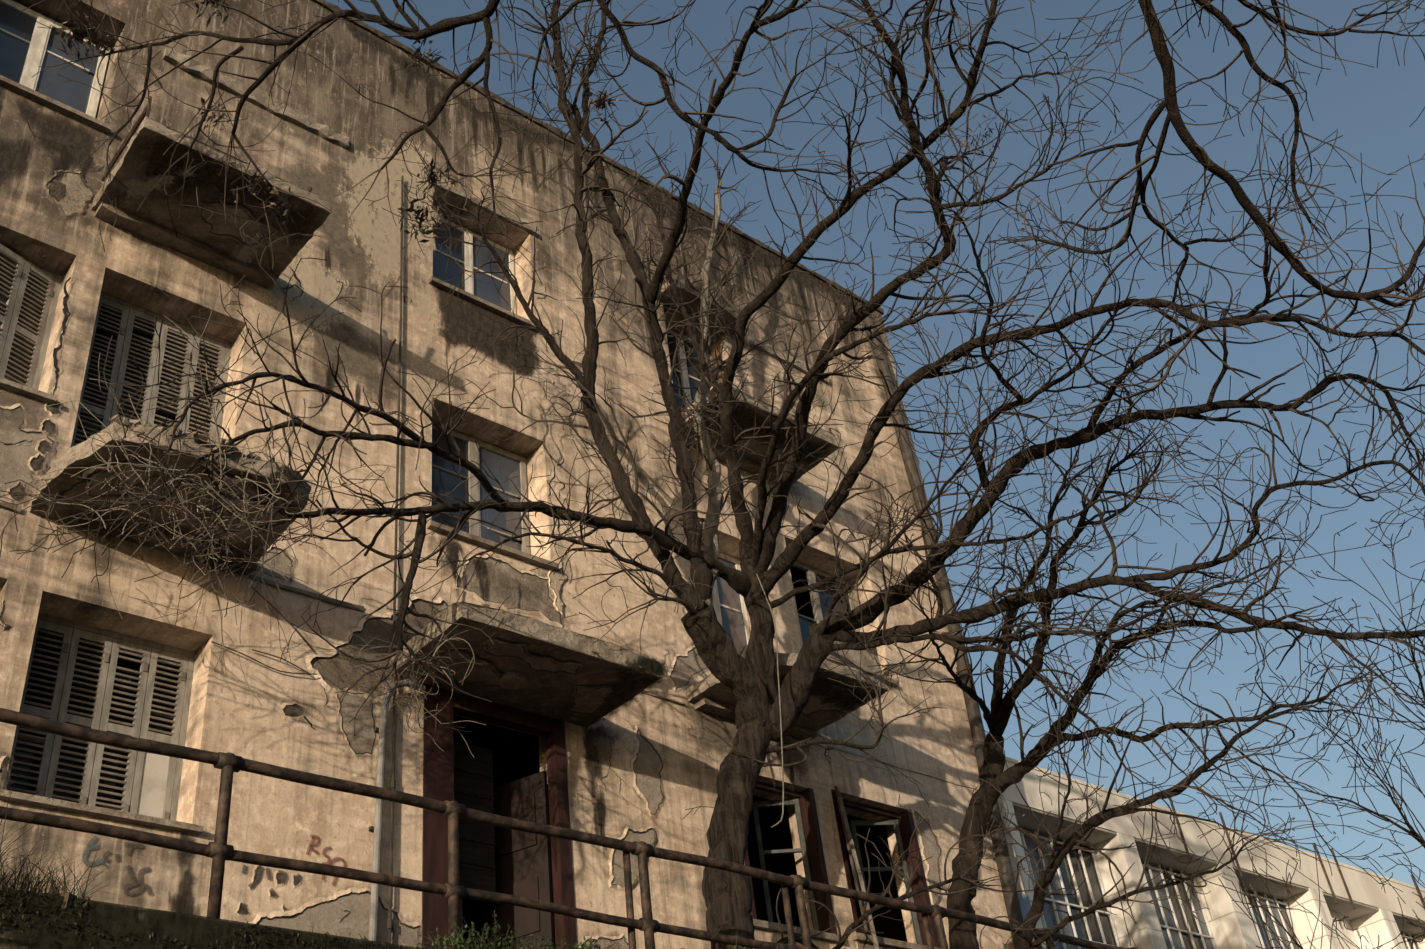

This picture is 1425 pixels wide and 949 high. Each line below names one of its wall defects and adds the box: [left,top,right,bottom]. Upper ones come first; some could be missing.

water stain [0,86,94,186]
water stain [332,12,859,344]
water stain [107,137,539,419]
flaking render [0,398,64,507]
spalling [305,532,572,756]
flaking render [608,726,665,891]
flaking render [220,865,423,948]